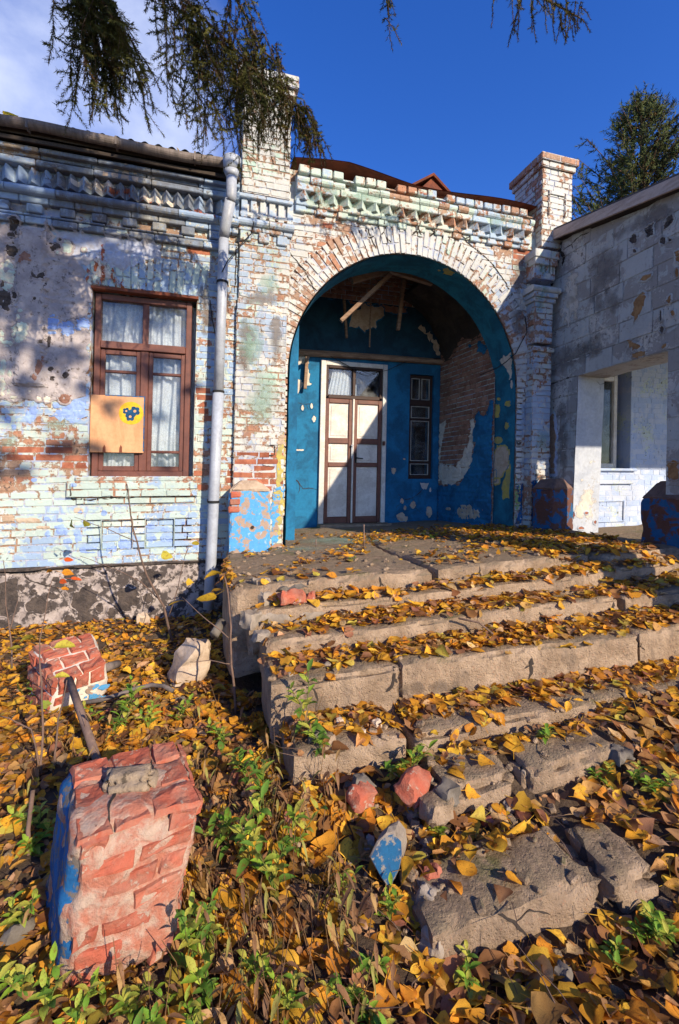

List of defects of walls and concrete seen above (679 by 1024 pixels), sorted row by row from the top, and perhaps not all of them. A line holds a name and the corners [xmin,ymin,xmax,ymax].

peeling [329,298,408,334]
peeling [2,446,87,469]
peeling [493,351,558,526]
peeling [226,432,305,546]
peeling [2,513,132,553]